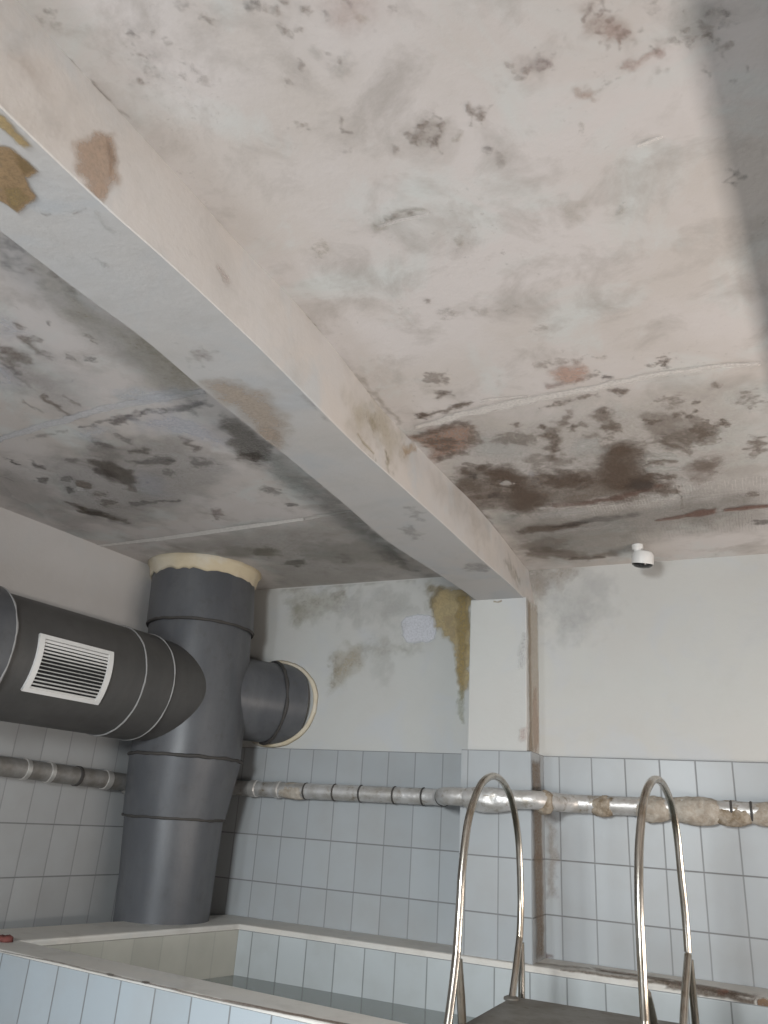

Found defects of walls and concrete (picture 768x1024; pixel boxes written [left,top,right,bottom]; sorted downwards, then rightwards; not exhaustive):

peeling [0,115,36,212]
peeling [77,133,116,198]
leakage [78,507,120,520]
leakage [90,449,173,504]
leakage [222,420,268,460]
leakage [459,444,682,532]
leakage [431,586,472,698]
rust [529,612,541,791]
rust [534,810,544,956]